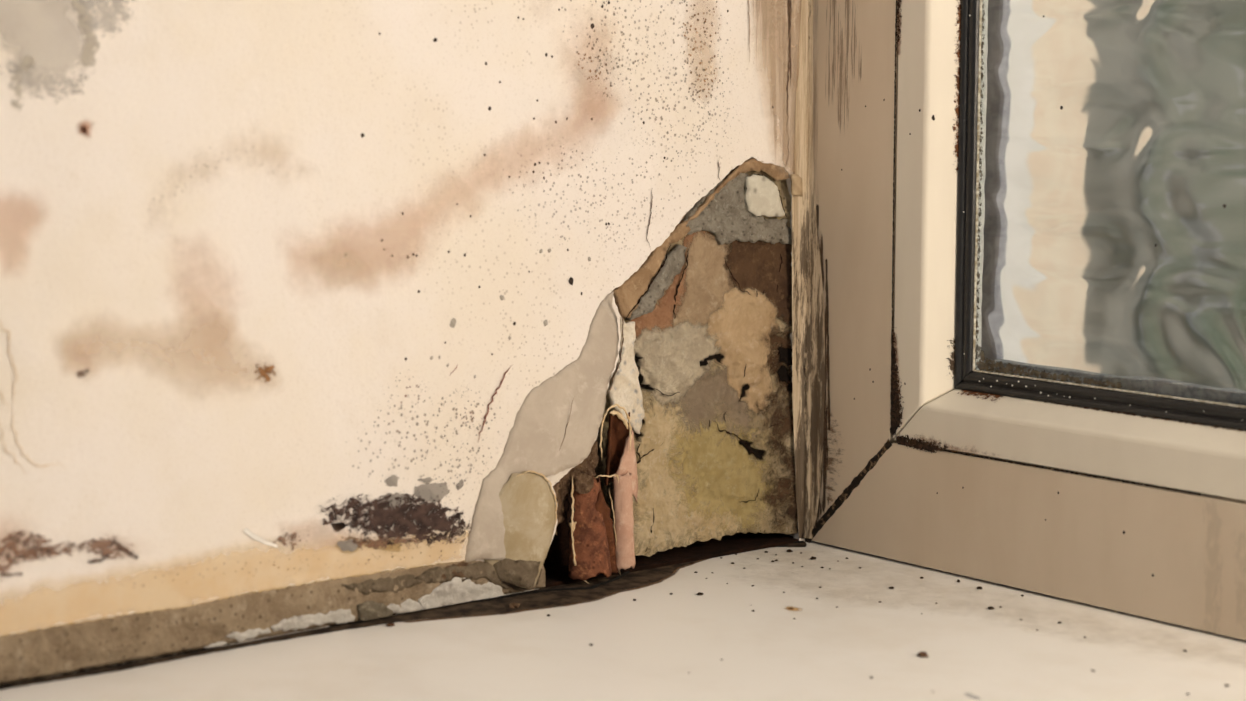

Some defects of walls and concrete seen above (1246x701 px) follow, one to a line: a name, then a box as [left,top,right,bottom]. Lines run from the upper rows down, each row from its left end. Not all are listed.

water stain [577,23,615,89]
crack [0,321,64,471]
water stain [256,363,276,382]
spalling [465,158,803,589]
water stain [815,204,841,525]
water stain [0,475,546,685]